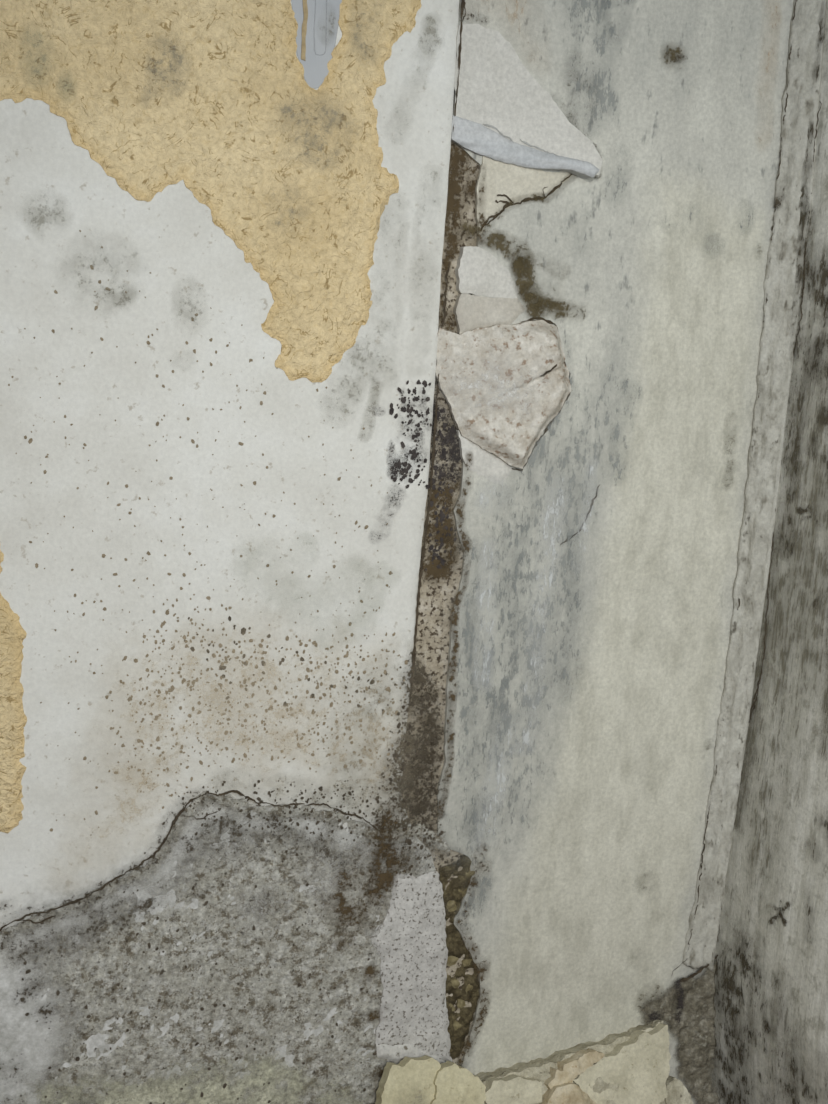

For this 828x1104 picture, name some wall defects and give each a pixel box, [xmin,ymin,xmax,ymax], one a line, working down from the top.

peeling [291,0,342,88]
peeling [451,24,602,235]
flaking render [435,293,571,485]
leakage [735,185,828,883]
leakage [105,366,640,1064]
leakage [0,886,167,1029]
leakage [41,1032,305,1104]
crack [0,790,379,939]
leakage [713,940,817,1104]
leakage [769,900,790,926]